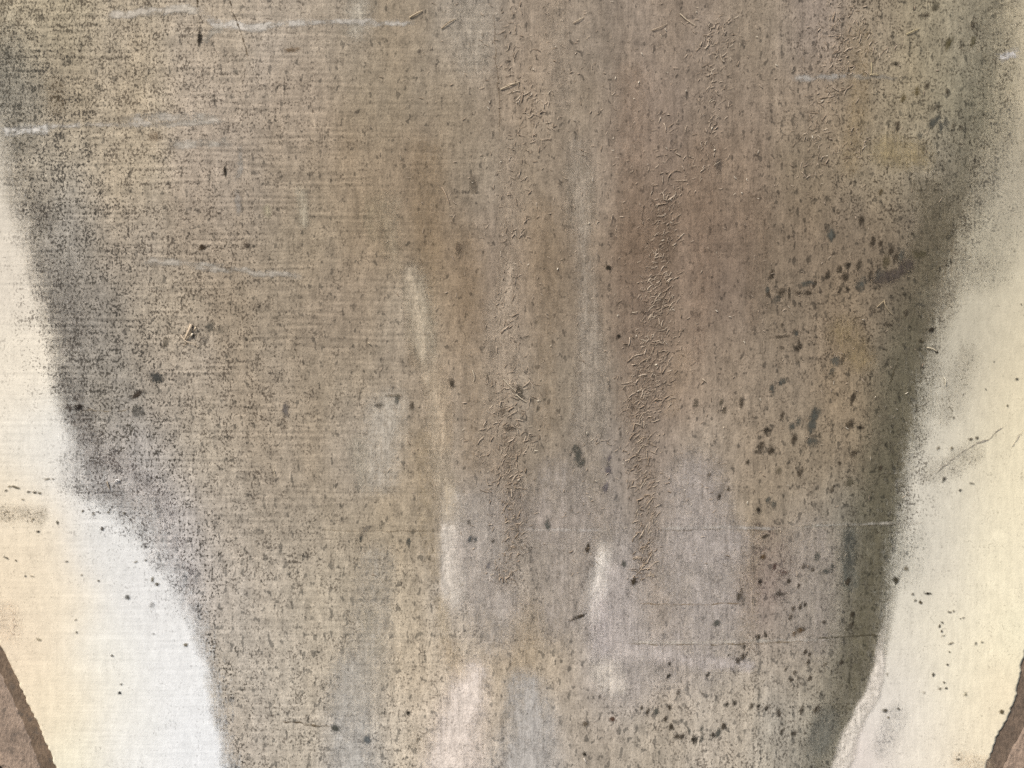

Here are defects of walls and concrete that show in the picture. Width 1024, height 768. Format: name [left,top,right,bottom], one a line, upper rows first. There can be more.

water stain [106,3,204,20]
water stain [307,0,414,44]
water stain [917,88,963,140]
water stain [0,24,255,766]
water stain [317,56,927,768]